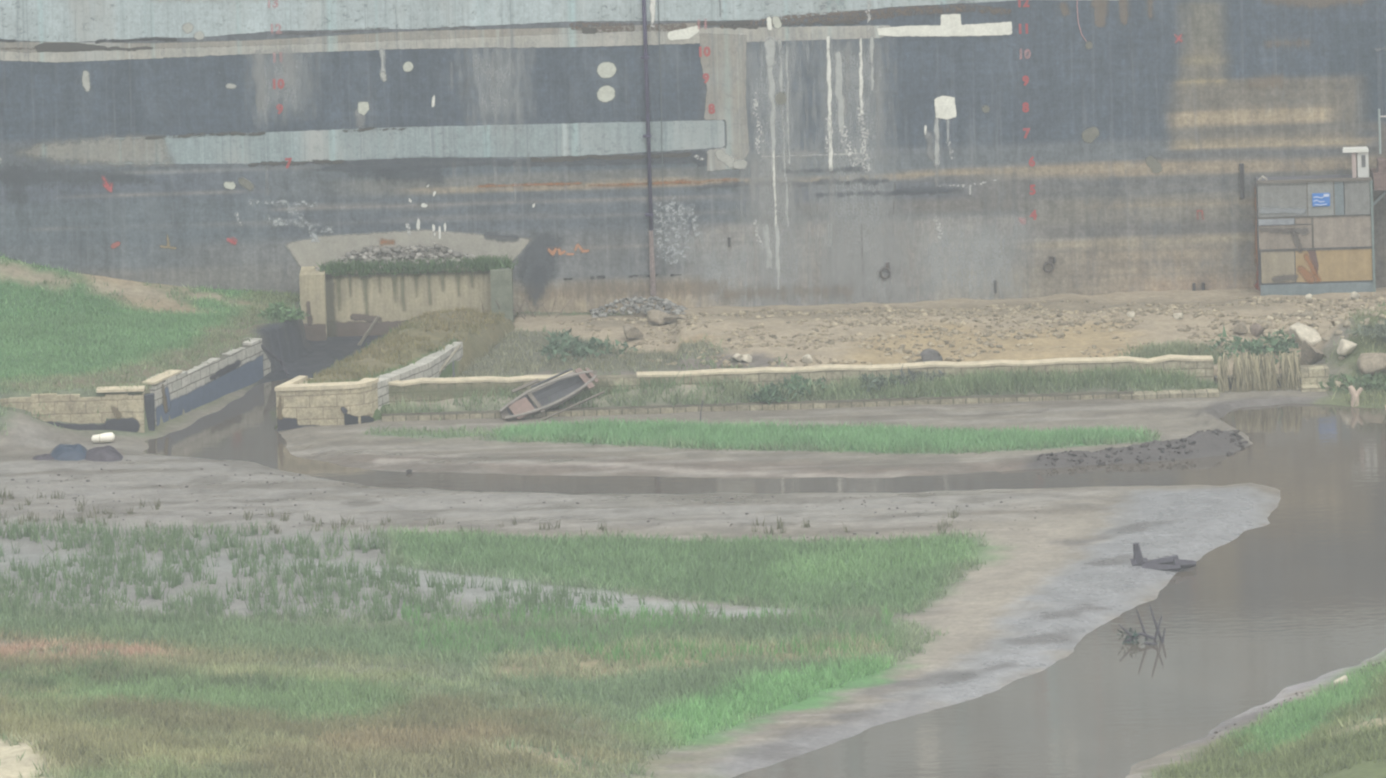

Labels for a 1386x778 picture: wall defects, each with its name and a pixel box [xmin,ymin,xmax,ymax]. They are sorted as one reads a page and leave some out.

damp [237,1,996,341]